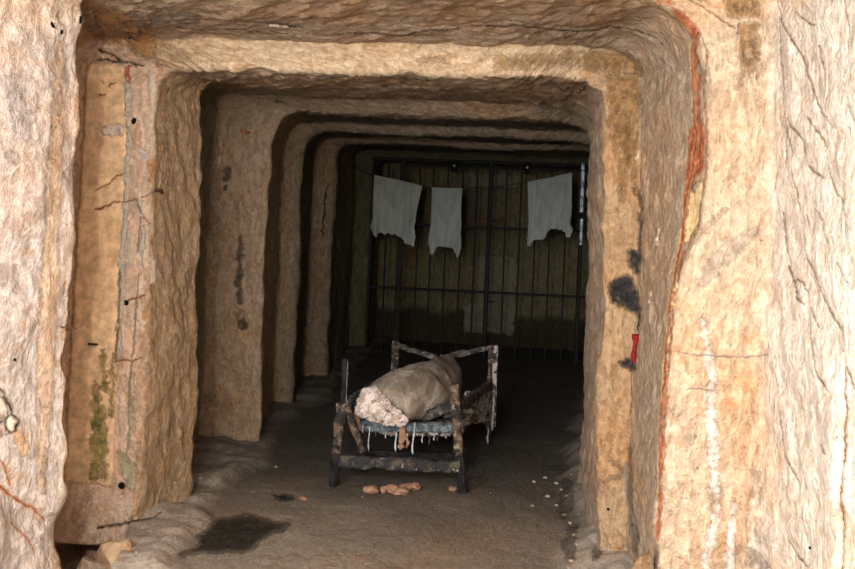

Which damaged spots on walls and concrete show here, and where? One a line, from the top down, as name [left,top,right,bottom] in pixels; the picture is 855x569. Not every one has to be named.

rust [655,0,707,228]
crack [0,389,19,434]
crack [0,461,45,521]
damp [99,349,117,418]
damp [178,513,291,559]
rust [654,241,685,541]
crack [624,0,767,569]
crack [779,11,855,569]